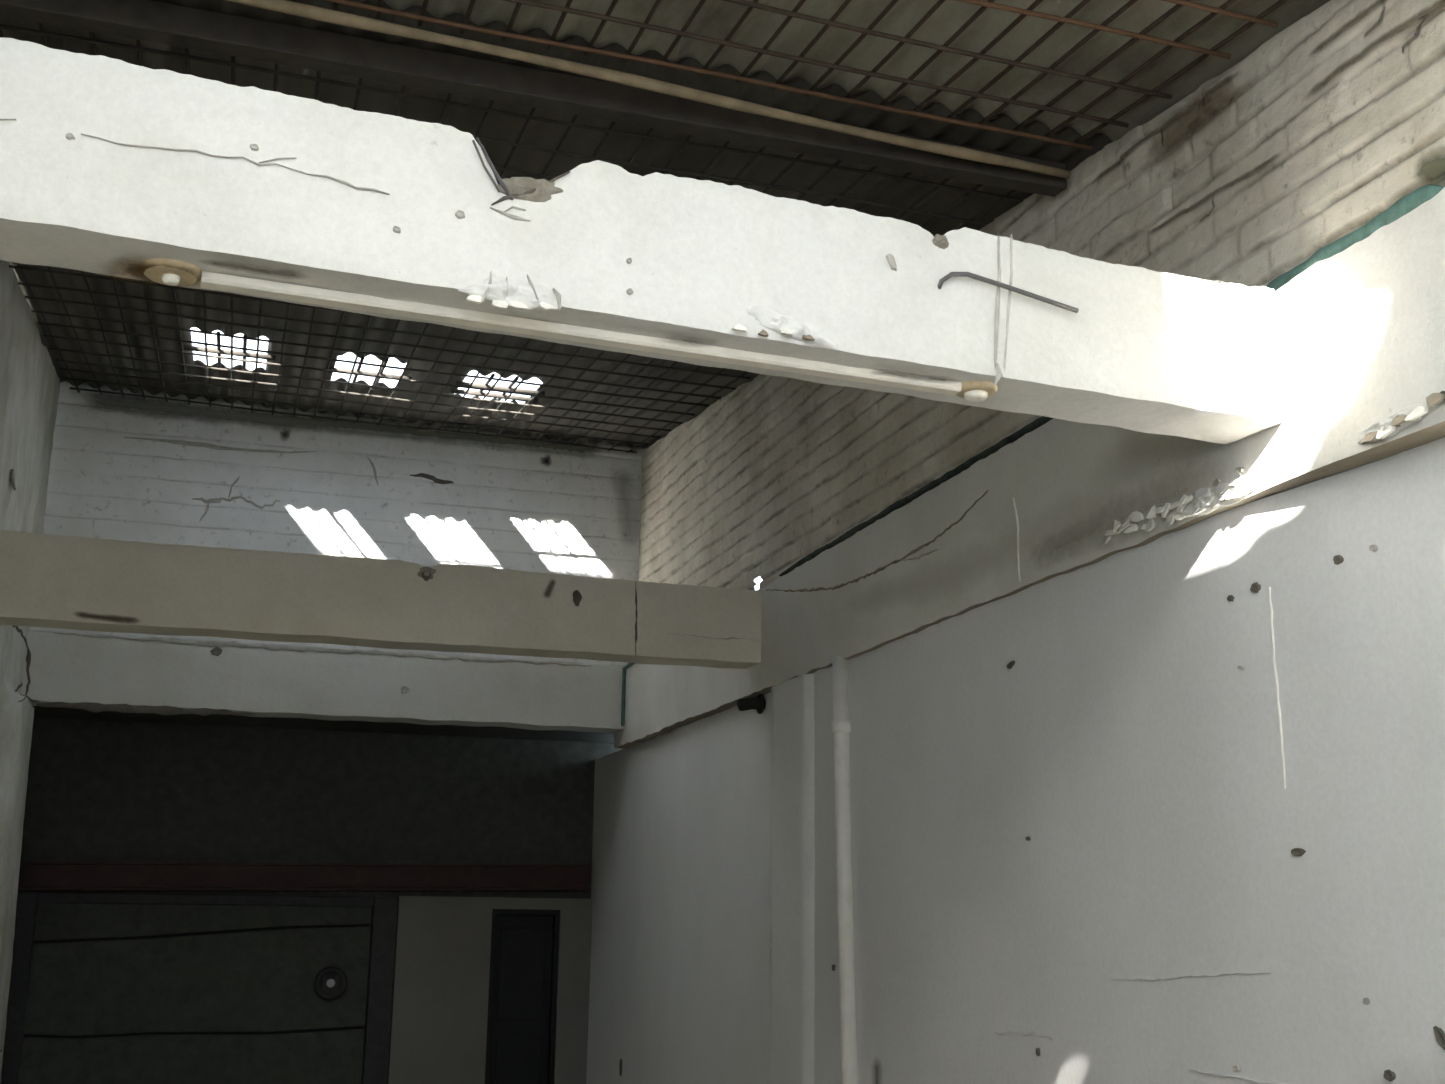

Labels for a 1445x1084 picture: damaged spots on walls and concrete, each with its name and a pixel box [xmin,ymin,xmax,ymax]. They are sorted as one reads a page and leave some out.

crack [81,133,390,195]
spalling [472,137,570,222]
flaking render [459,271,563,311]
flaking render [731,306,838,349]
spalling [1357,391,1445,445]
crack [124,437,317,522]
peeling [1104,467,1268,544]
crack [13,626,591,702]
crack [1108,972,1271,981]